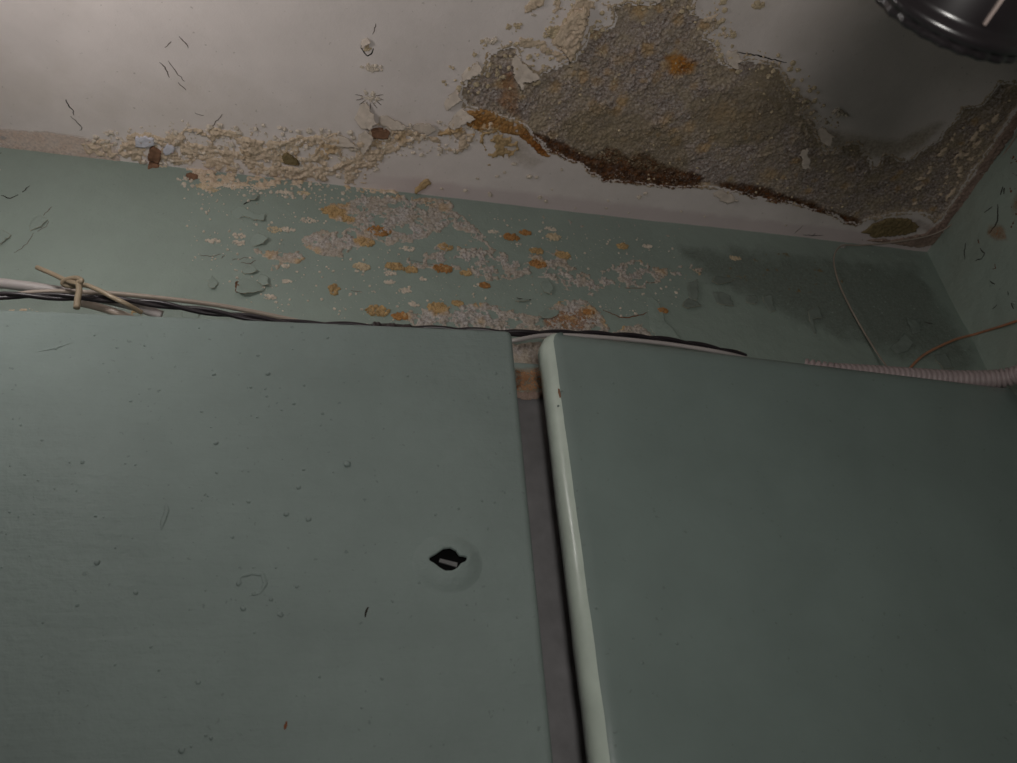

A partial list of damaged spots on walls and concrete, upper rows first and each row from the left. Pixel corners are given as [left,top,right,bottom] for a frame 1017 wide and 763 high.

flaking render [0,0,1017,248]
rust [466,108,702,190]